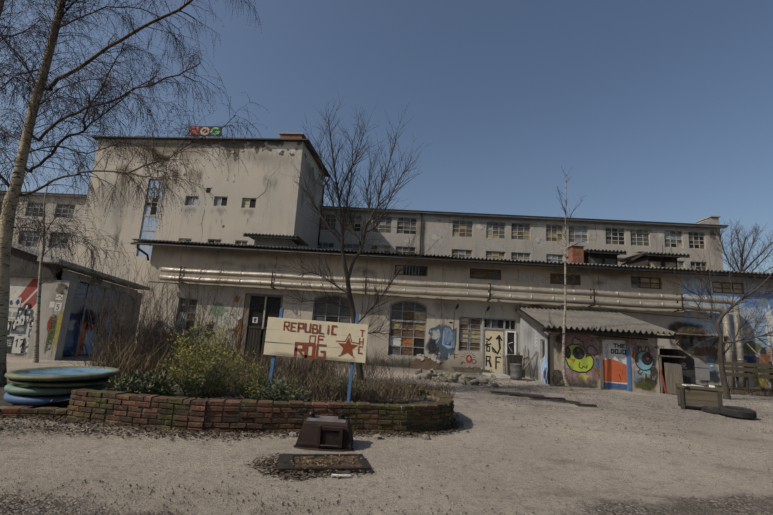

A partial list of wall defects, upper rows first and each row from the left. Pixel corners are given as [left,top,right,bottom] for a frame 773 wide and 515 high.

spalling [191,141,324,180]